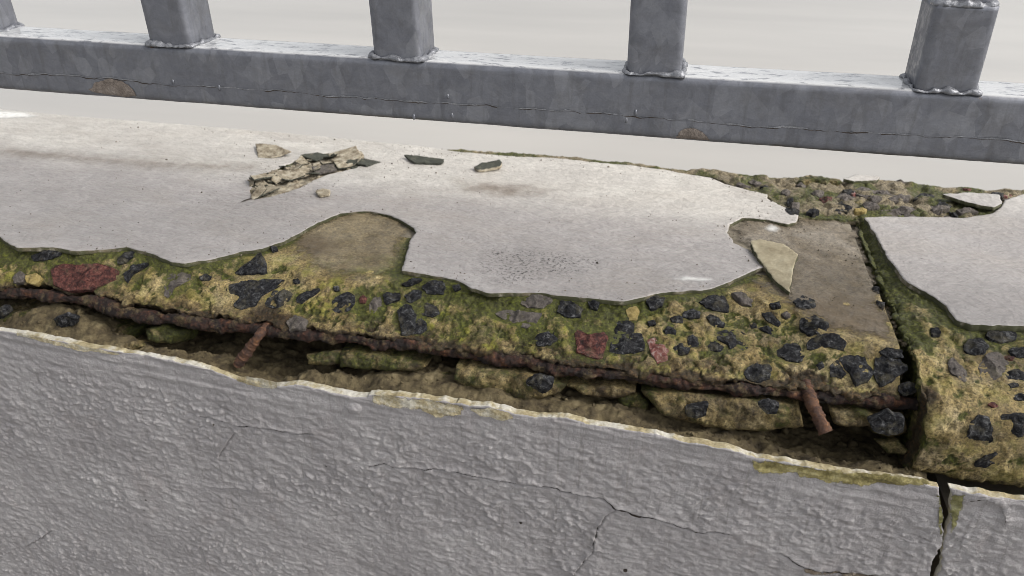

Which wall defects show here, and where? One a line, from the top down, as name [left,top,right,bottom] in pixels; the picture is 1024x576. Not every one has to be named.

rust [89,78,136,97]
rust [676,128,709,141]
spalling [0,143,1024,489]
crack [577,500,729,570]